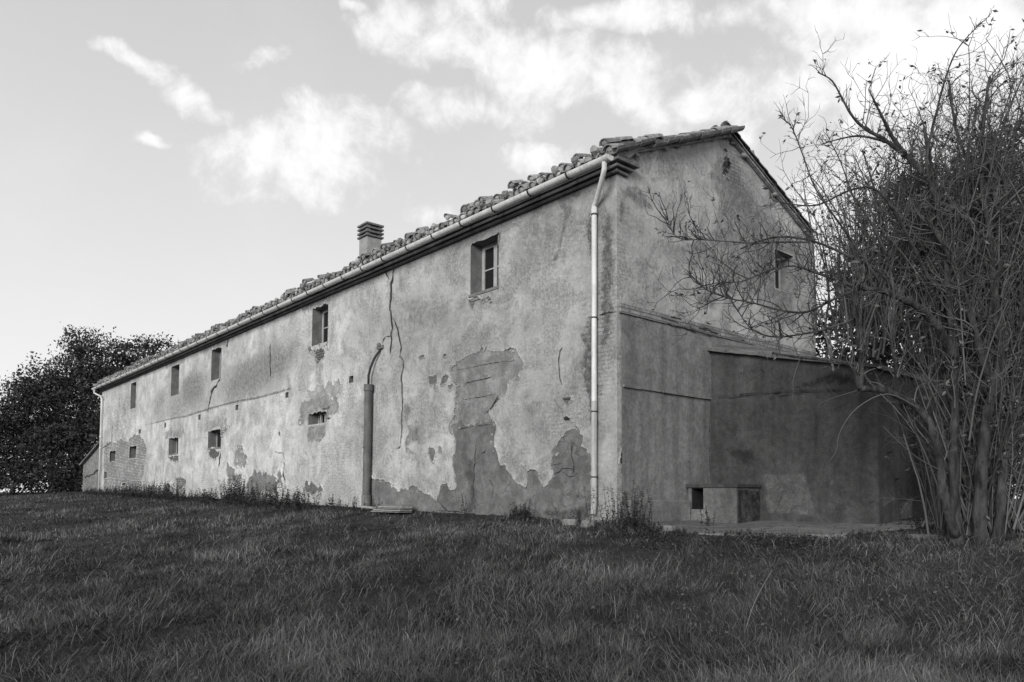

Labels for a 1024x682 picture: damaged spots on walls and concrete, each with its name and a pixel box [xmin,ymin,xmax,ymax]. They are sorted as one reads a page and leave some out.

flaking render [103,433,147,491]
peeling [203,413,284,496]
crack [382,269,403,448]
peeling [370,345,593,521]